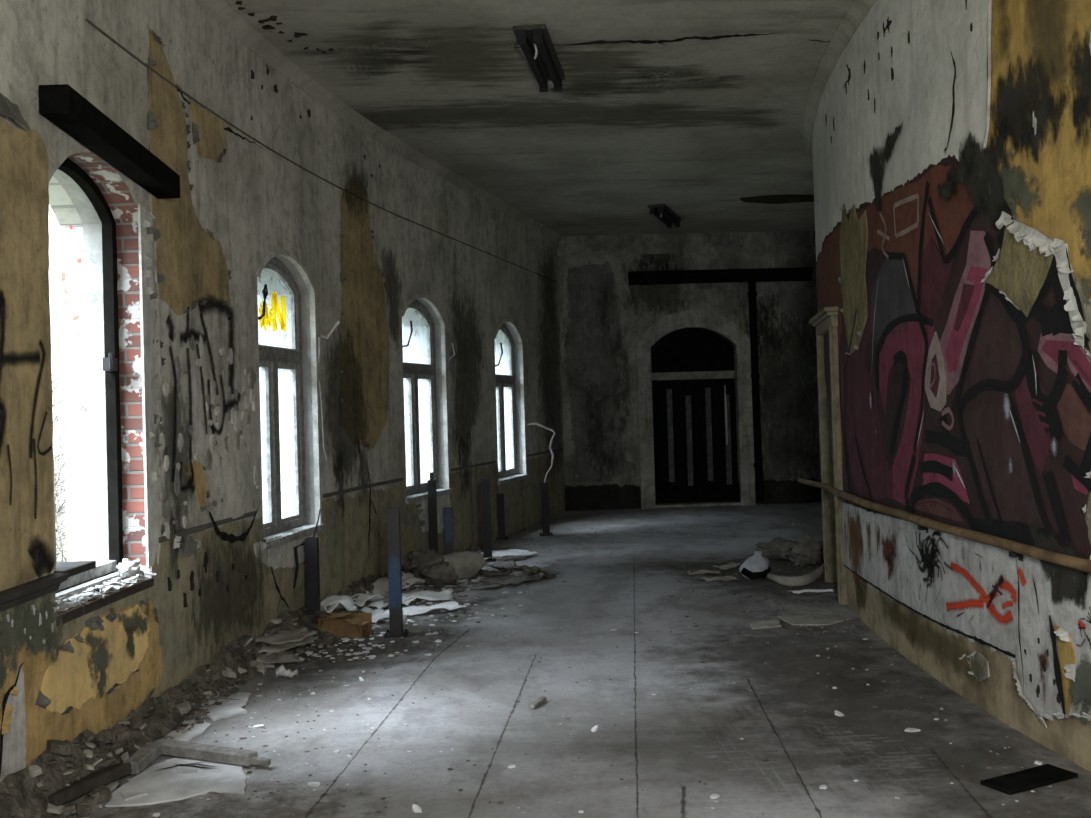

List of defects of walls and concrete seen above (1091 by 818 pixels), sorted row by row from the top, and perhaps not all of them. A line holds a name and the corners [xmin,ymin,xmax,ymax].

leakage [235,1,510,87]
leakage [355,43,772,128]
crack [554,33,775,47]
spalling [877,16,894,81]
leakage [937,33,1091,225]
flaking render [980,0,1091,357]
leakage [1070,189,1091,258]
peeling [838,204,868,355]
flaking render [0,28,259,783]
flaking render [1082,492,1091,545]
peeling [842,502,1091,728]